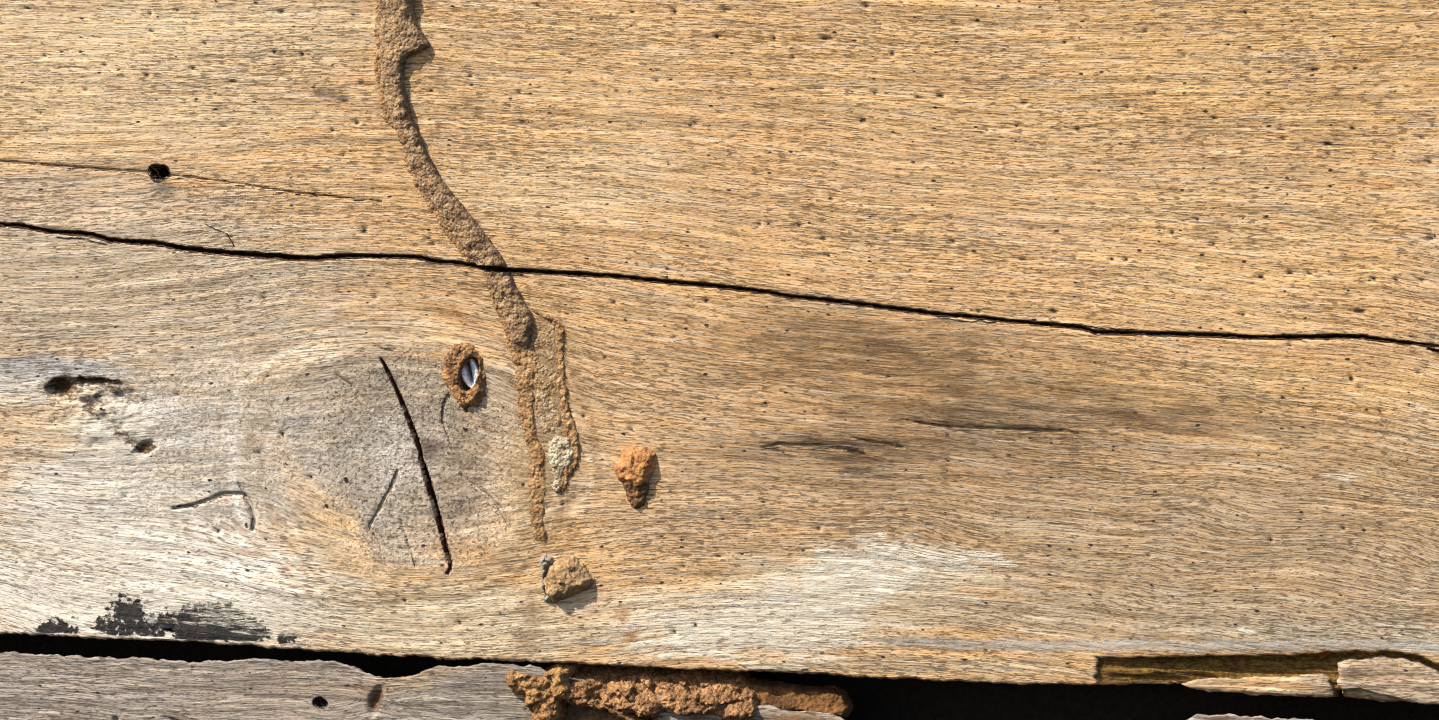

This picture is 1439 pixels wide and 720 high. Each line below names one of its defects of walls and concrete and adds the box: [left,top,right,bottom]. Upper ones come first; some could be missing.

crack [0,222,1439,353]
crack [340,348,510,574]
water stain [0,508,368,644]
spalling [1095,651,1439,688]